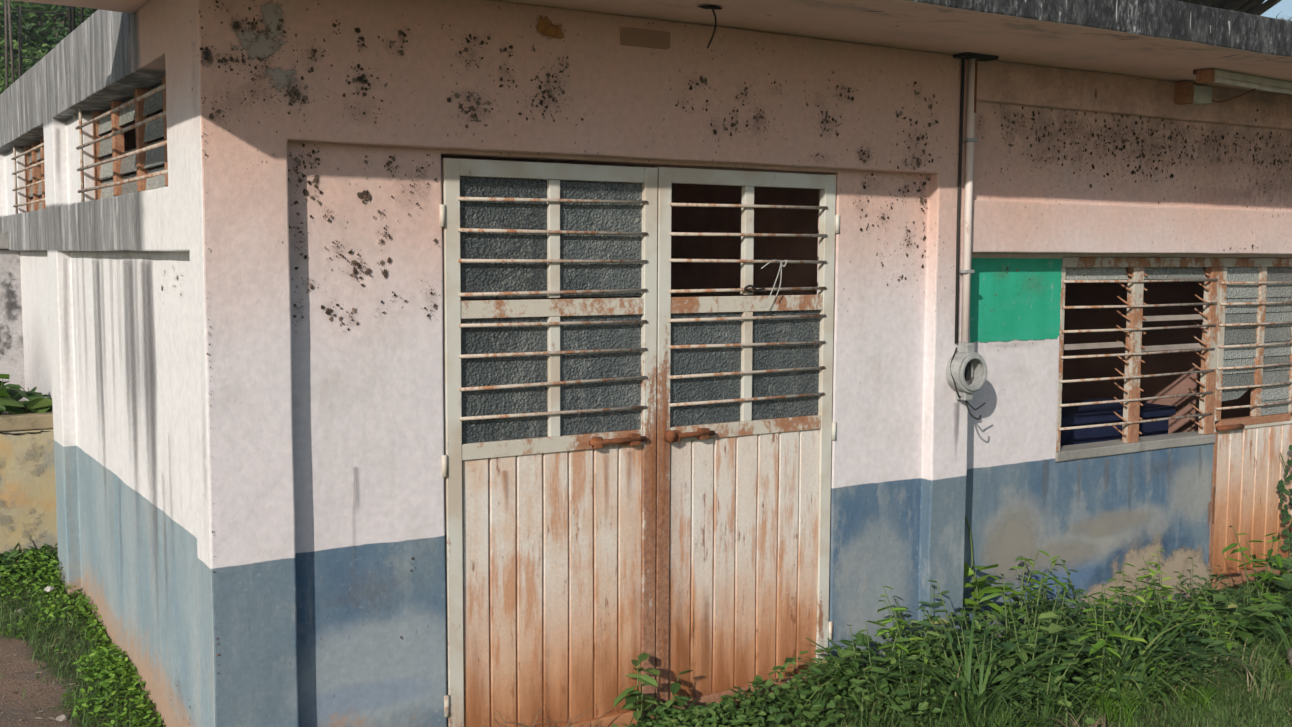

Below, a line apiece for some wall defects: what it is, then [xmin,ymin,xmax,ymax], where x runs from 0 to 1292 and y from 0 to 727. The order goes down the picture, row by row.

damp [0,273,20,354]
crack [0,428,48,436]
peeling [990,521,1033,579]
peeling [1081,539,1211,612]